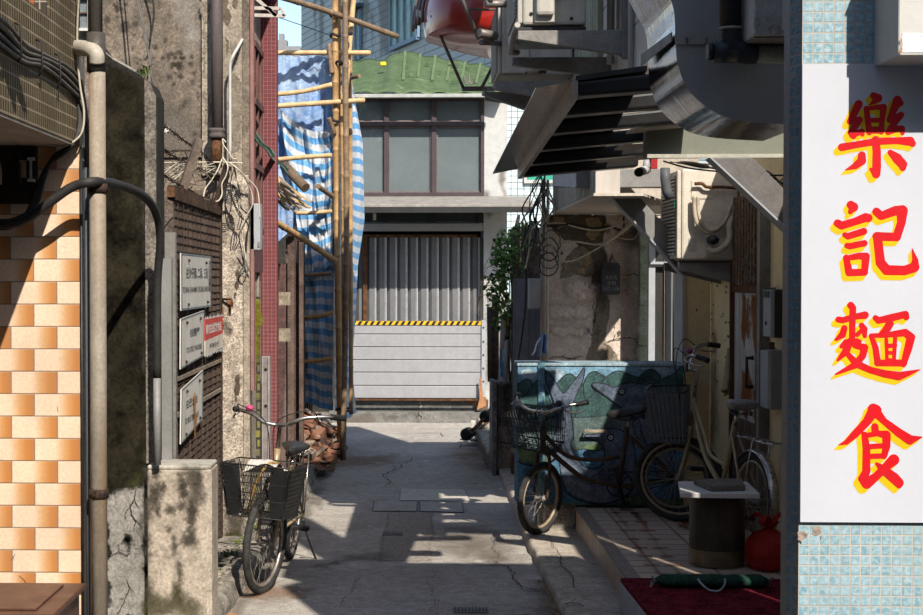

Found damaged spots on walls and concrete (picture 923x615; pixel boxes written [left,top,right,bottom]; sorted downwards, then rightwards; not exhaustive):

water stain [154,38,195,85]
water stain [105,62,203,598]
flaking render [549,214,633,361]
rust [741,294,756,349]
crack [491,535,540,591]
crack [550,538,585,607]